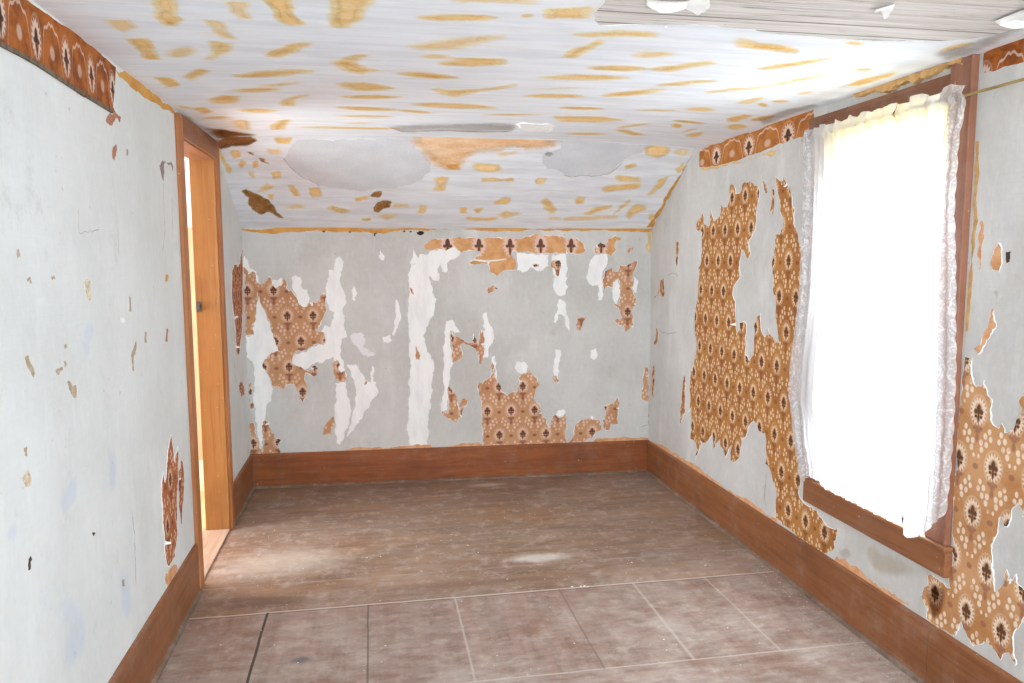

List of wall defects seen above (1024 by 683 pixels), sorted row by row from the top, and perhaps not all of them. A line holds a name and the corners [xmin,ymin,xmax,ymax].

peeling [594,0,1024,42]
peeling [106,113,121,126]
peeling [467,154,693,250]
peeling [533,251,567,276]